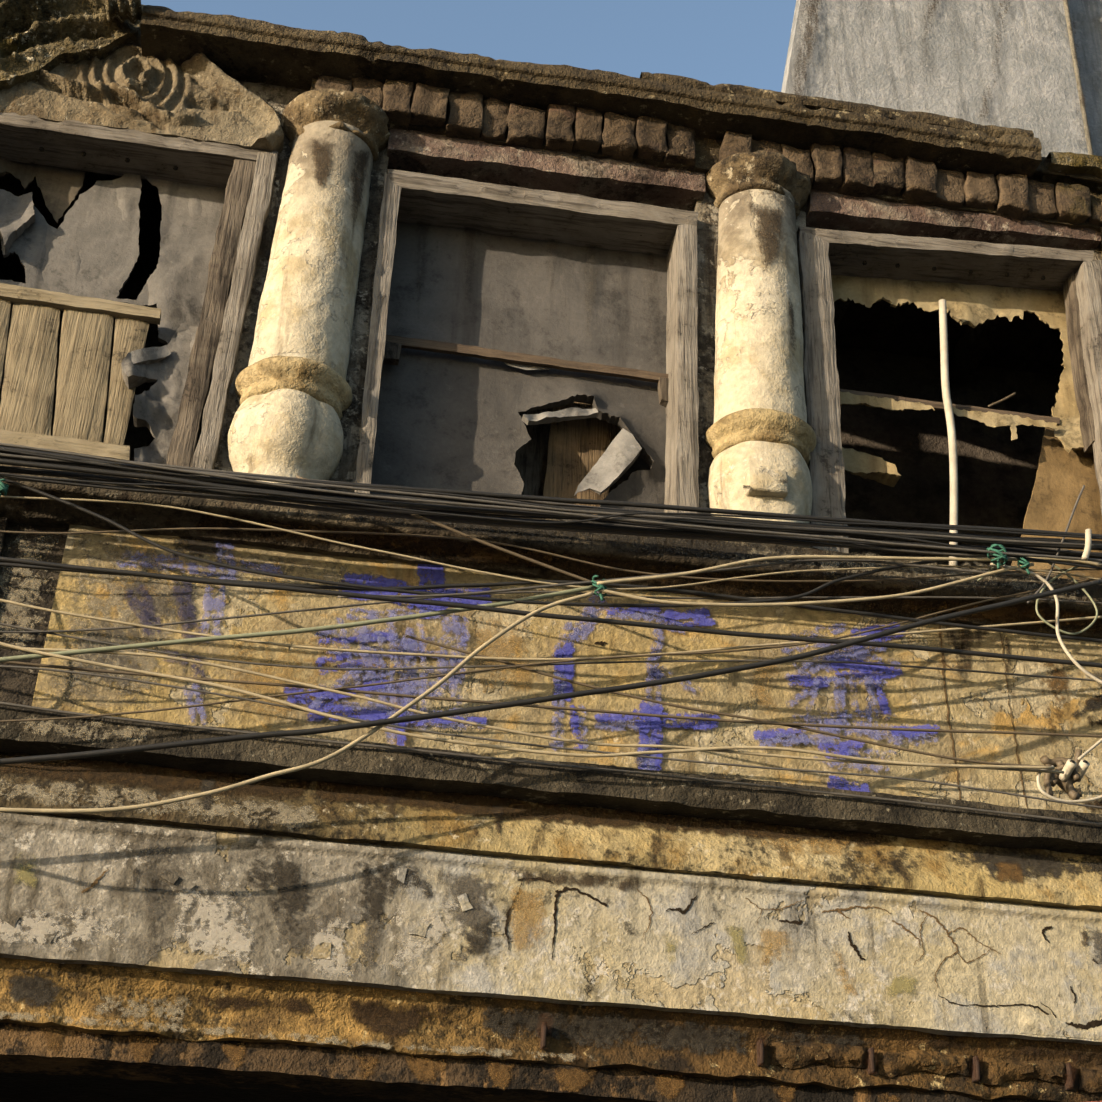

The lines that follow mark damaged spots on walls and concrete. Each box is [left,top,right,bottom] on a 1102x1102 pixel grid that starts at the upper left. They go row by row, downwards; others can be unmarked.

leakage [312,140,333,185]
leakage [351,150,369,219]
leakage [749,202,782,268]
leakage [246,859,335,954]
crack [505,877,607,958]
crack [746,898,1102,1030]